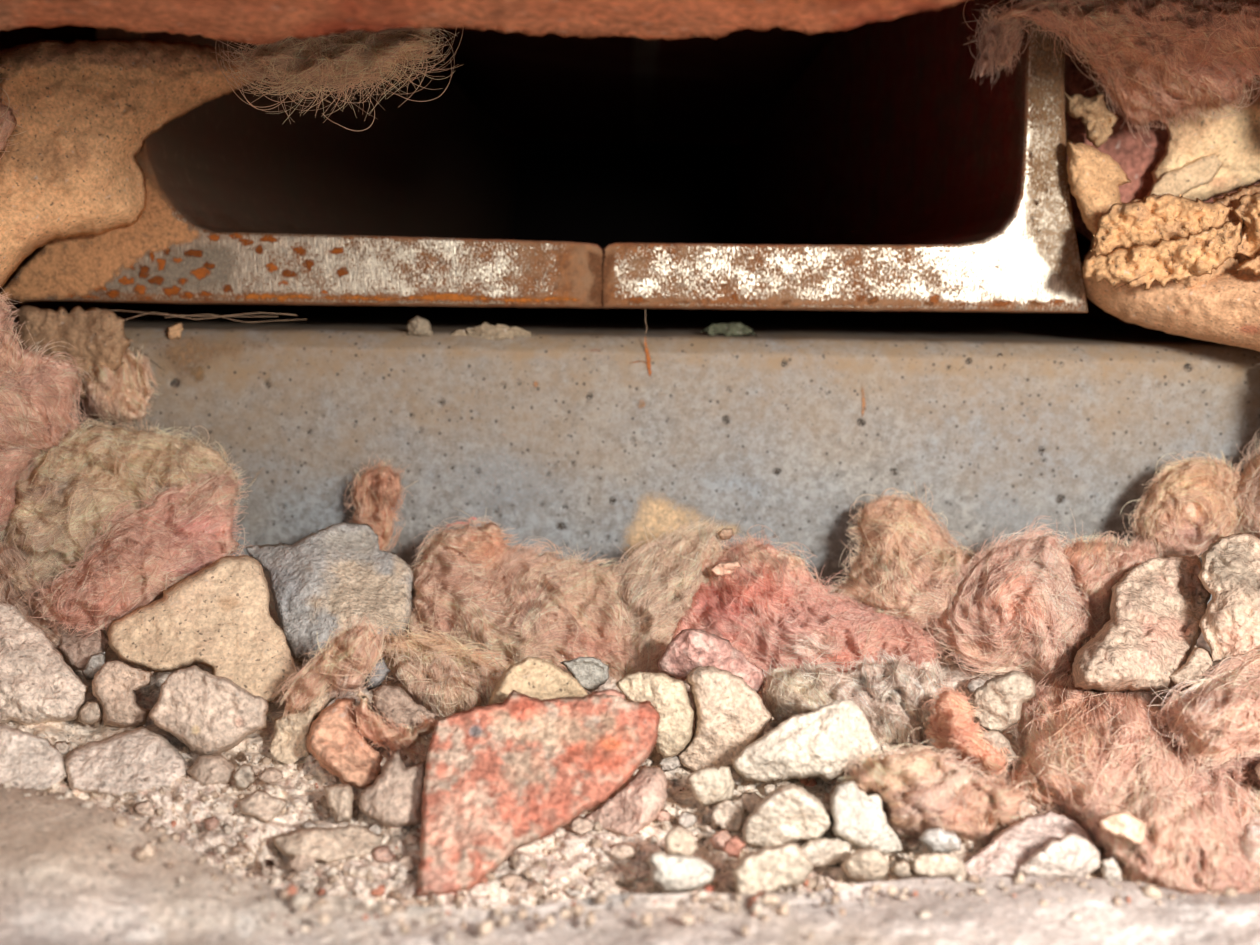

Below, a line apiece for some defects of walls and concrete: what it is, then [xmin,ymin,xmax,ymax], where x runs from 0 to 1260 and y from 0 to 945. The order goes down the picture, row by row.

corrosion [68,233,614,304]